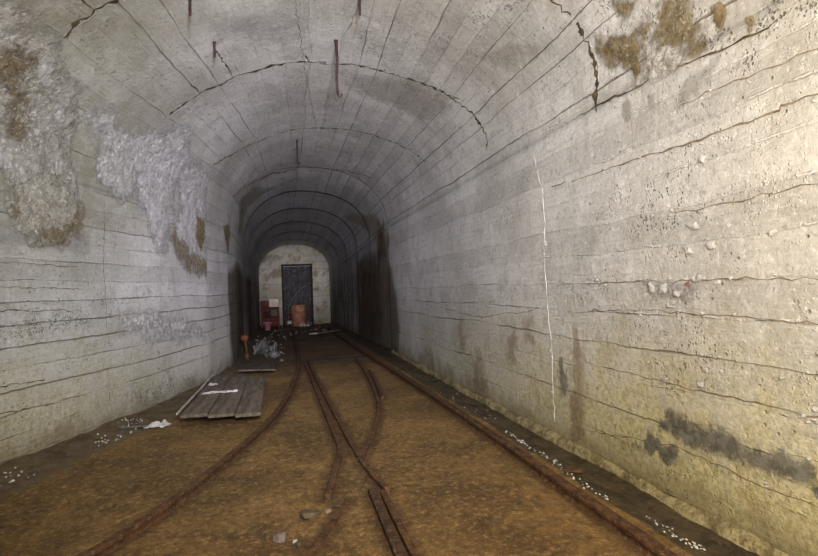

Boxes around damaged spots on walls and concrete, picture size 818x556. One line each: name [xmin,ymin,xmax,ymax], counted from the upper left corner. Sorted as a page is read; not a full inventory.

crack [63,0,119,39]
crack [164,0,488,166]
spalling [634,36,686,88]
crack [535,0,790,121]
crack [677,48,818,108]
water stain [0,1,213,276]
crack [0,286,82,312]
crack [439,94,818,423]
crack [0,376,110,414]
water stain [636,409,818,498]